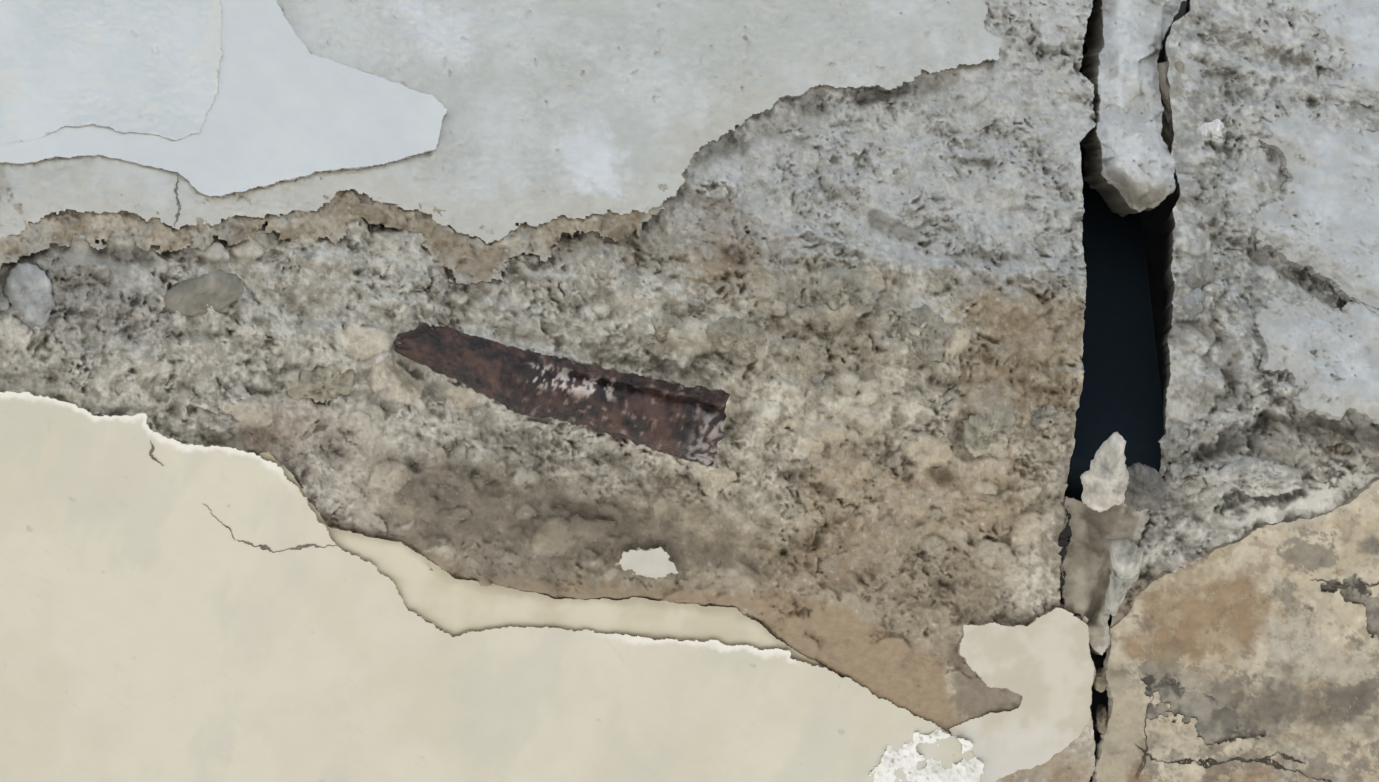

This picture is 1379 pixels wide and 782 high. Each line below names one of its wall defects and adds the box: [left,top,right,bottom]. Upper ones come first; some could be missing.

crack [173,181,181,227]
spalling [0,0,1096,733]
crack [149,444,163,466]
crack [204,504,338,553]
crack [1058,505,1072,594]
spalling [996,705,1096,782]
peeling [1141,673,1265,745]
crack [1135,679,1332,782]